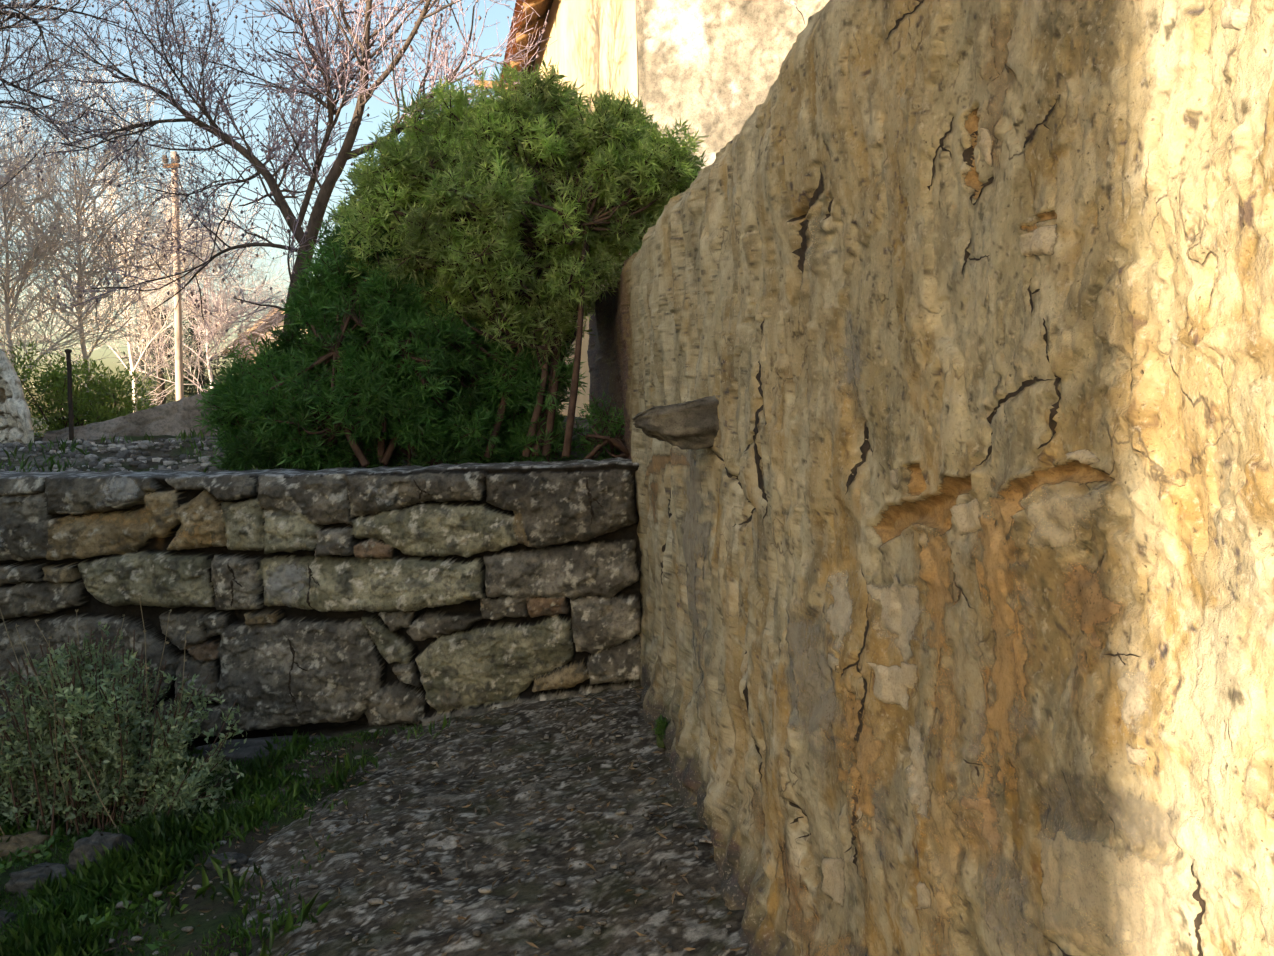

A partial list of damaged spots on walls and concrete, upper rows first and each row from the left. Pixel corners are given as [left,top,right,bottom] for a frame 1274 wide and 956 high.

crack [787,167,834,289]
crack [977,278,1061,466]
crack [716,318,768,527]
crack [846,422,873,493]
spalling [872,464,982,546]
spalling [1003,449,1115,512]
crack [841,569,869,743]
crack [844,784,861,880]
crack [1191,856,1205,956]